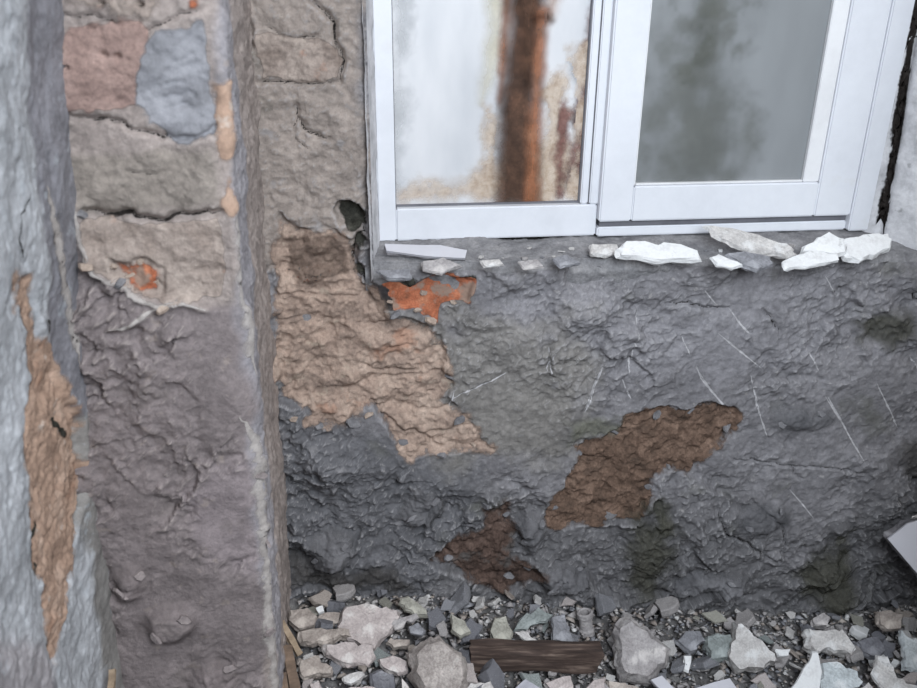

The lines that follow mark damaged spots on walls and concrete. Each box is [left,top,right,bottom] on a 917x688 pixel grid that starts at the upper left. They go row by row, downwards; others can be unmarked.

flaking render [62,0,156,113]
corrosion [400,0,588,202]
crack [877,0,917,234]
flaking render [47,186,81,370]
flaking render [74,181,257,375]
spalling [270,222,497,463]
spalling [479,259,504,269]
flaking render [12,271,89,660]
spalling [430,501,549,595]
spalling [544,402,743,530]
spalling [883,515,917,576]